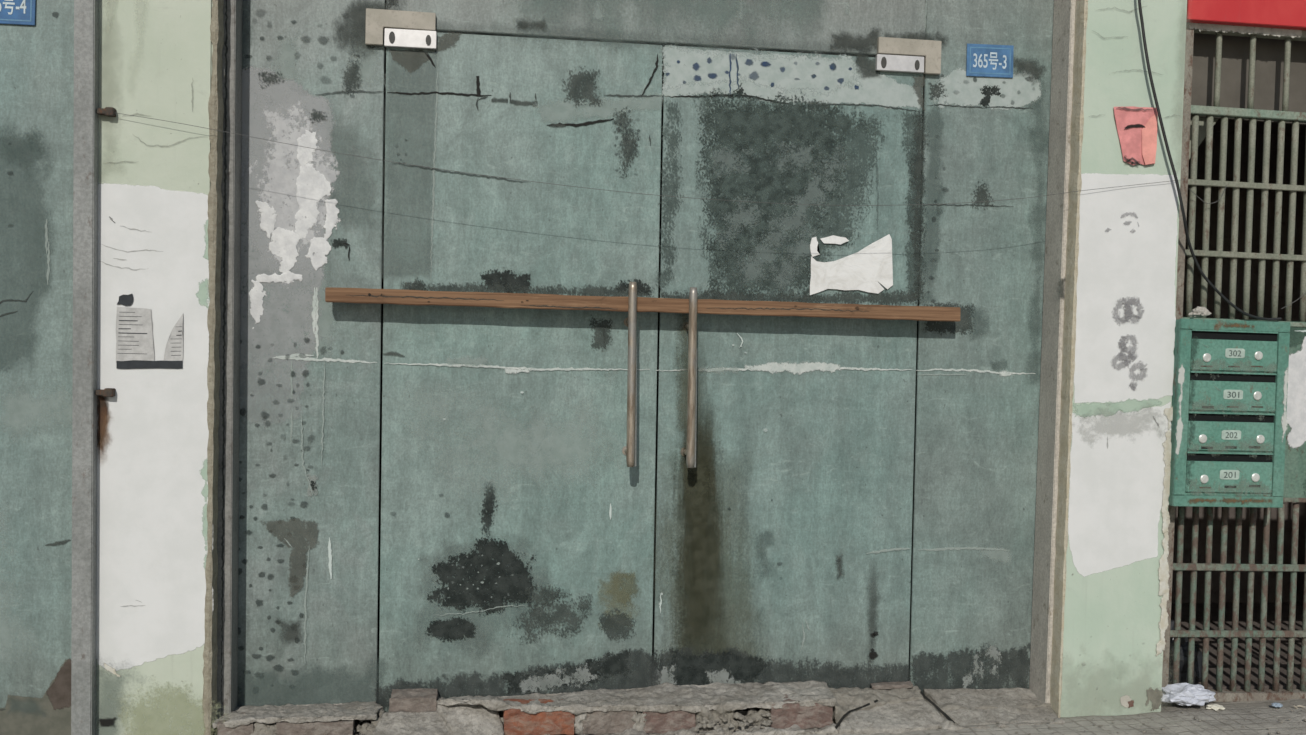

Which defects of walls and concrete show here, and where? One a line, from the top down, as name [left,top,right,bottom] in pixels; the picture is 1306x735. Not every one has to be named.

crack [315,54,1026,127]
peeling [856,55,879,77]
peeling [913,76,925,110]
peeling [249,130,341,329]
corrosion [97,395,109,449]
spalling [1050,0,1185,718]
peeling [1281,336,1306,448]
damp [480,489,498,540]
damp [671,313,751,657]
damp [503,651,631,696]